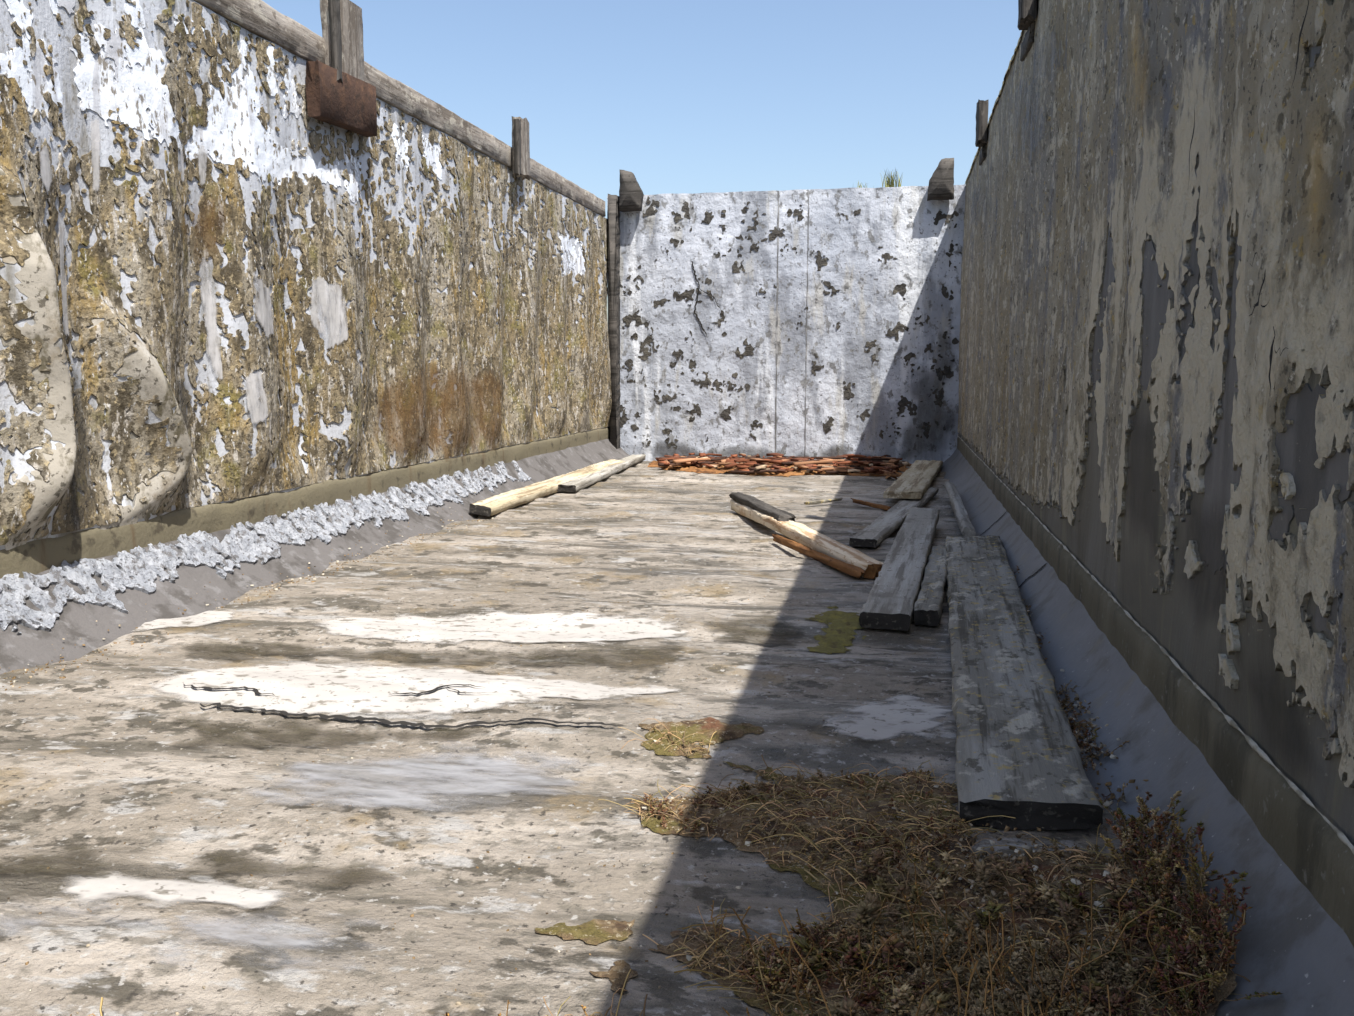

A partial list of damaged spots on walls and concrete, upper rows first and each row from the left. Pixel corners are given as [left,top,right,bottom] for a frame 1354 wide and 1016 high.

peeling [0,0,363,203]
peeling [391,123,442,180]
spalling [620,277,757,449]
spalling [620,196,840,382]
spalling [821,416,834,434]
spalling [843,381,875,421]
spalling [864,283,930,364]
spalling [879,284,959,439]
spalling [933,204,962,268]
spalling [1091,209,1242,579]
spalling [1269,383,1352,542]
peeling [1217,604,1240,689]